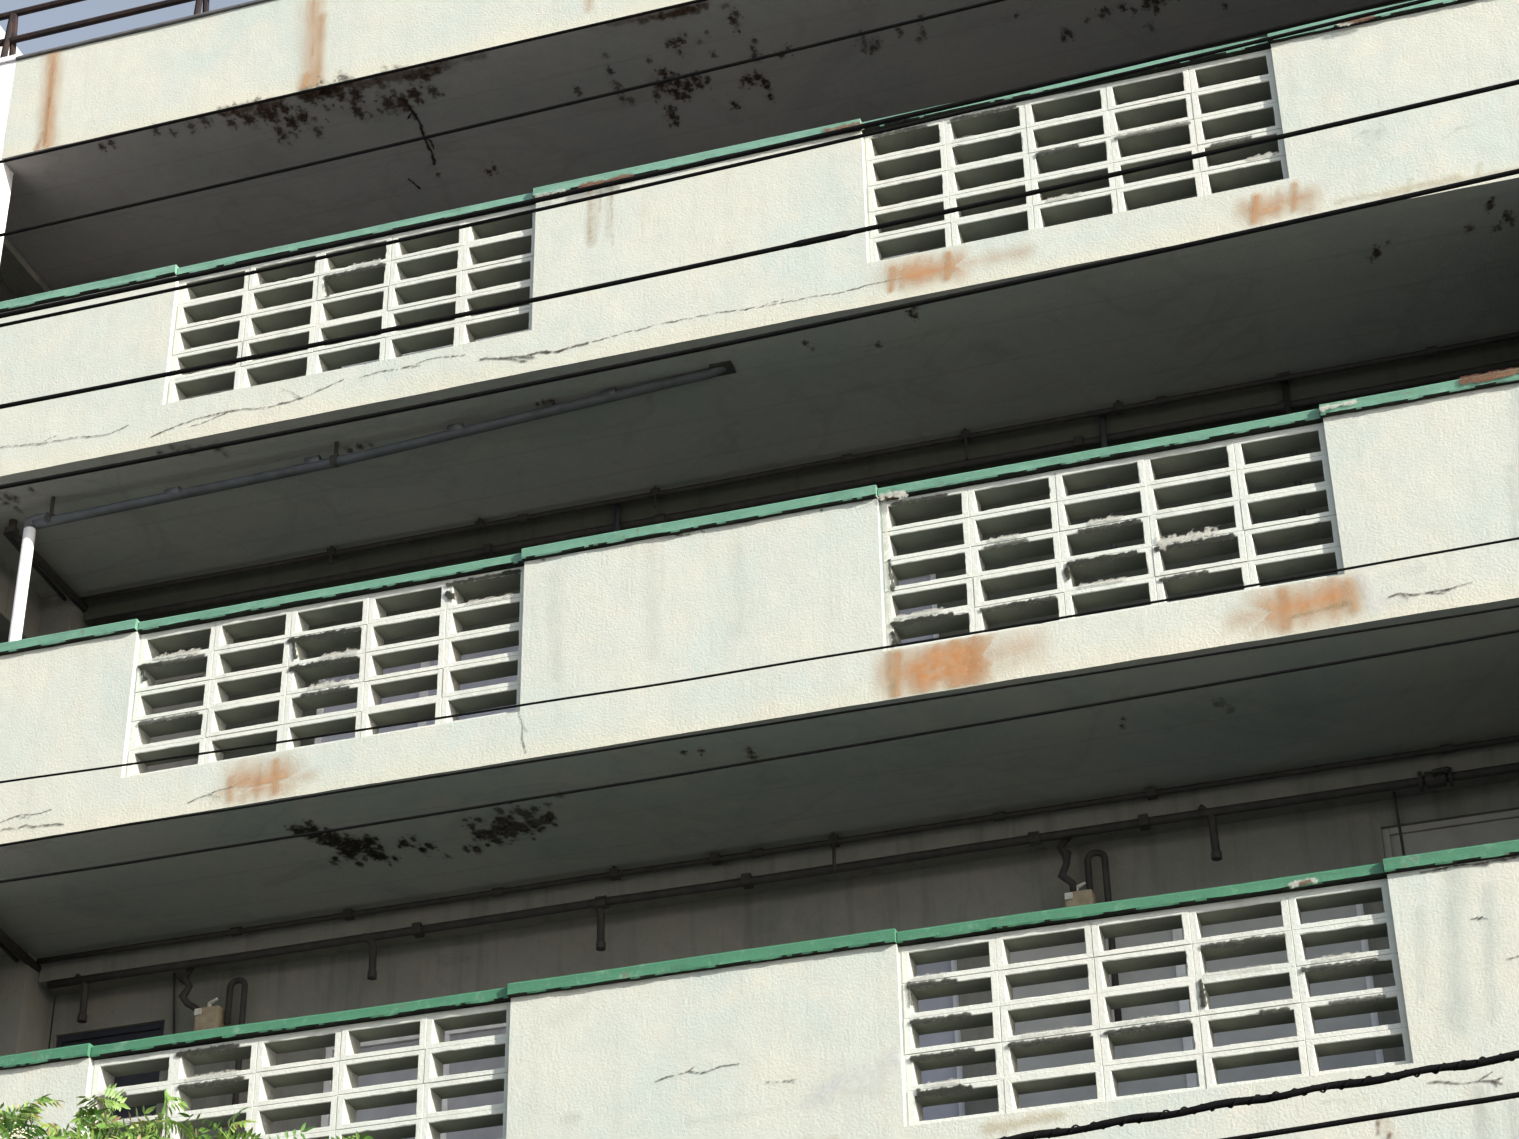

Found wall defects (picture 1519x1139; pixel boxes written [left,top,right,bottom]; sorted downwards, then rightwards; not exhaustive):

peeling [728,11,790,110]
corrosion [36,52,56,150]
peeling [154,70,440,143]
peeling [653,68,710,127]
corrosion [889,252,961,291]
crack [3,278,901,447]
corrosion [1259,580,1357,629]
corrosion [887,636,992,697]
peeling [284,820,434,866]
peeling [462,803,557,853]
crack [655,1063,792,1082]
crack [1432,1072,1502,1087]